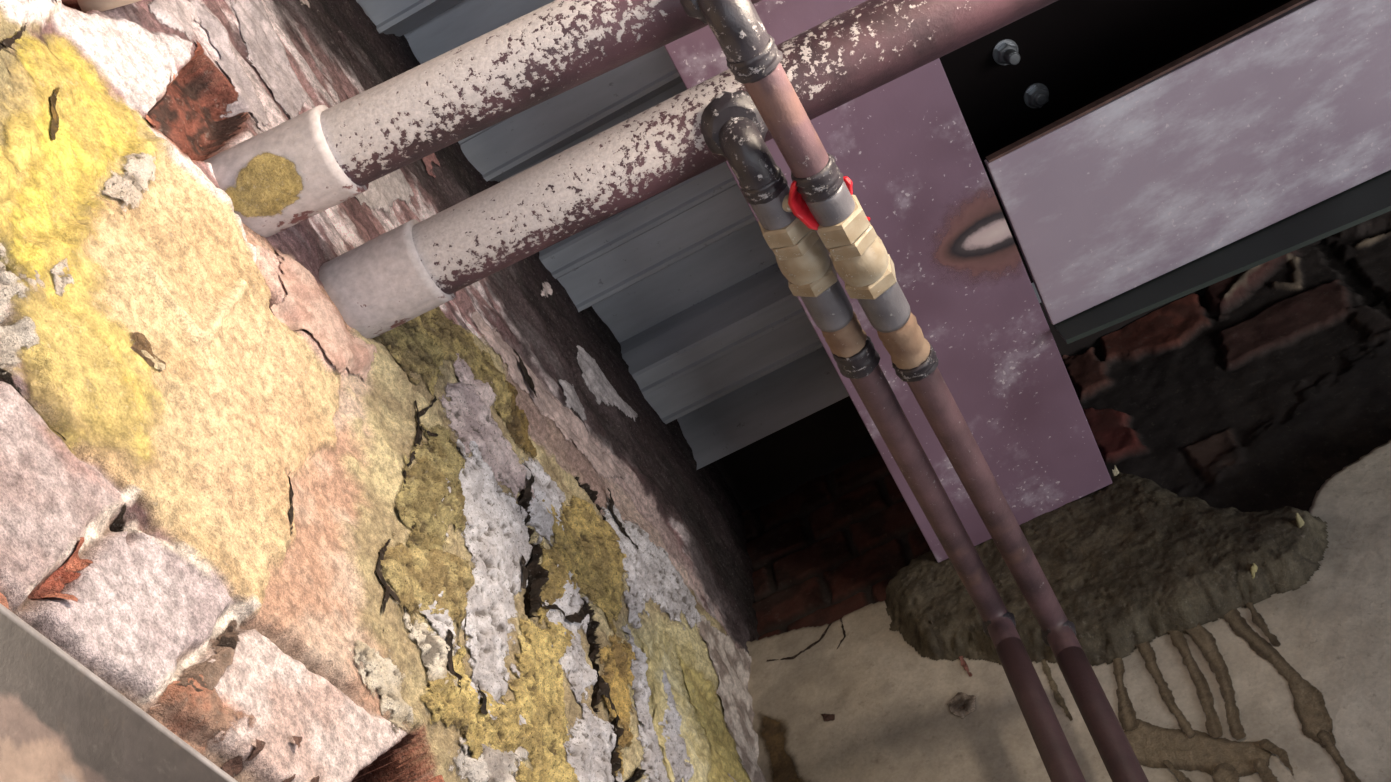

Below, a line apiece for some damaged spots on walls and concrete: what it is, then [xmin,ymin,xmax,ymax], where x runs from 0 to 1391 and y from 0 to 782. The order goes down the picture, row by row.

peeling [145,0,309,162]
crack [403,395,438,488]
peeling [471,311,638,479]
spalling [149,620,265,778]
crack [376,526,414,632]
spalling [352,734,445,782]
crack [446,618,488,715]
crack [517,464,646,782]
rust [759,715,804,782]
damp [1113,658,1139,731]
damp [1135,622,1294,782]
damp [1317,730,1361,782]